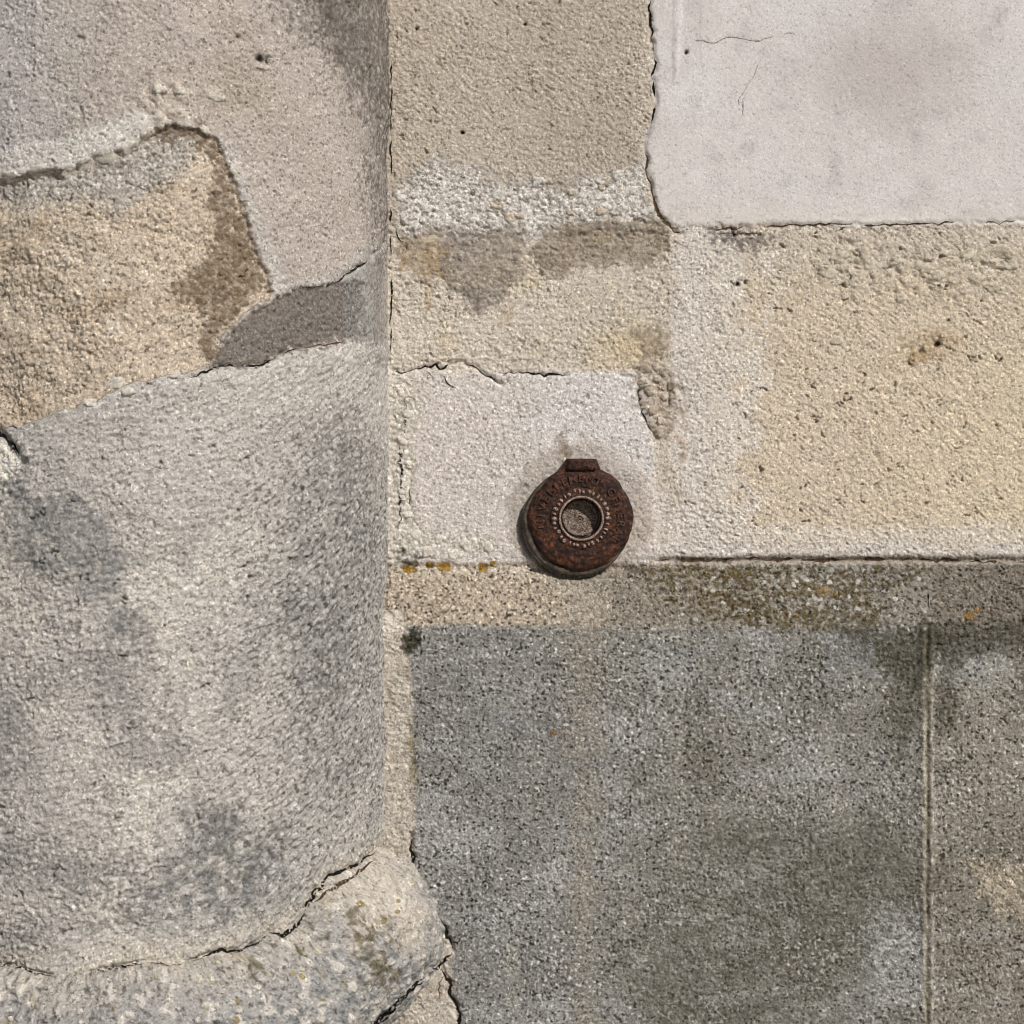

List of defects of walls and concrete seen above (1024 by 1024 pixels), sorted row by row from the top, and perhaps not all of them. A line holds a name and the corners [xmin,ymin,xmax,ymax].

crack [695,32,797,117]
spalling [0,114,274,482]
crack [299,60,567,535]
leakage [439,209,671,315]
crack [190,340,345,378]
crack [95,853,374,973]